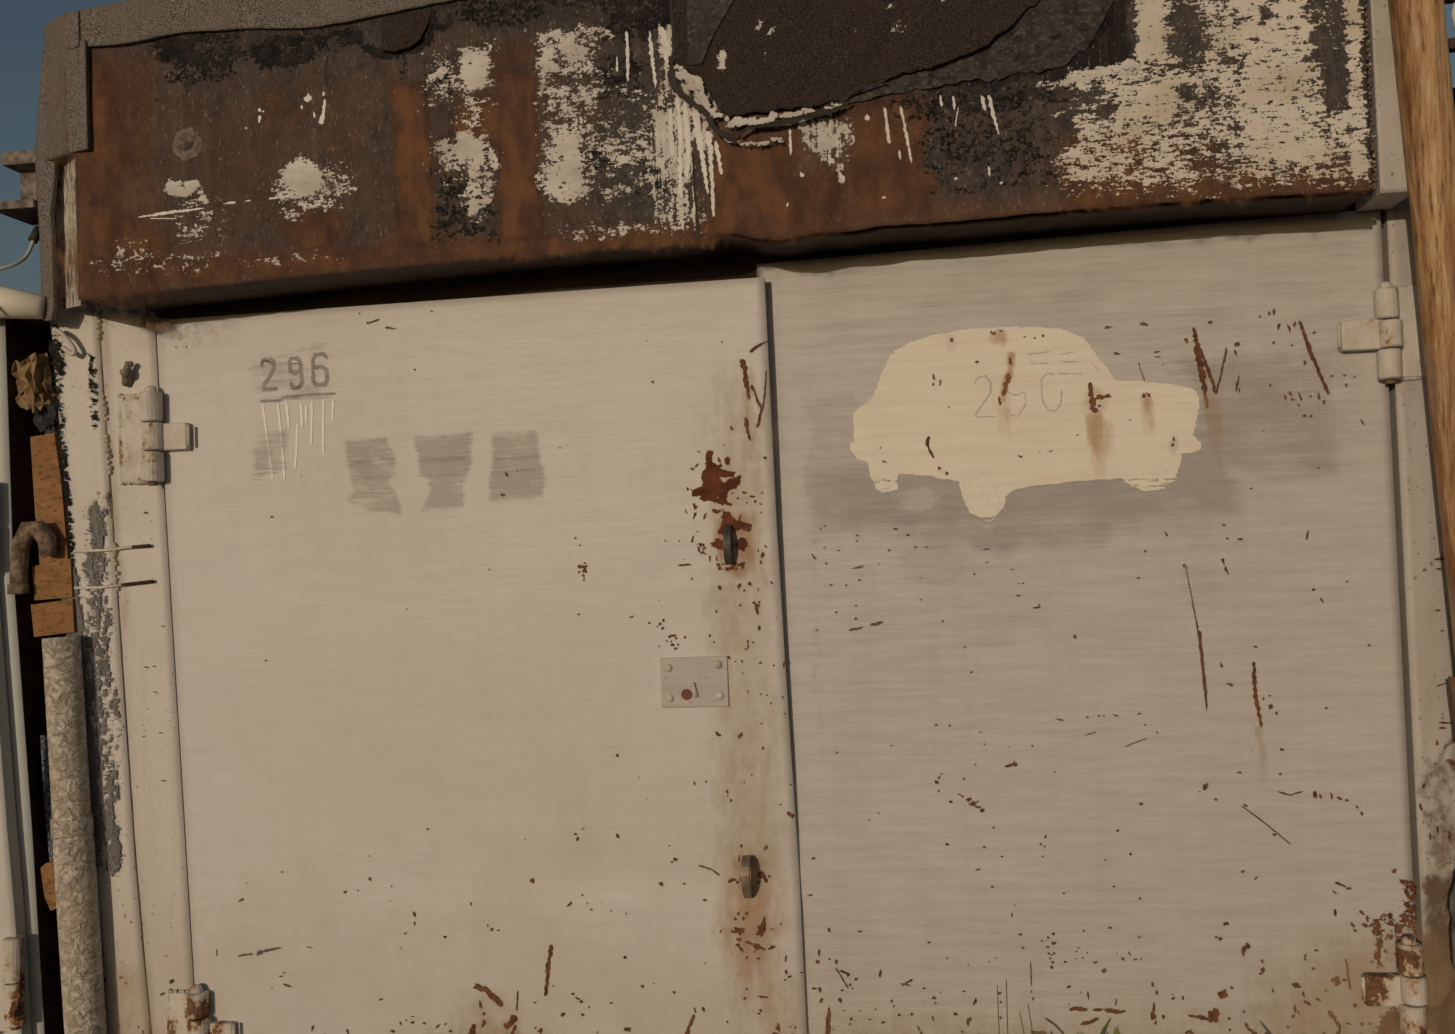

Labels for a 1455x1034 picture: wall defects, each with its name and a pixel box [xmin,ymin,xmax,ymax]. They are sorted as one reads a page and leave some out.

peeling [1036,0,1379,199]
rust [55,42,936,298]
rust [1057,127,1368,209]
rust [678,445,767,580]
peeling [61,492,121,877]
rust [468,983,518,1034]
rust [728,844,771,884]
rust [719,911,804,981]
rust [1359,814,1455,1034]